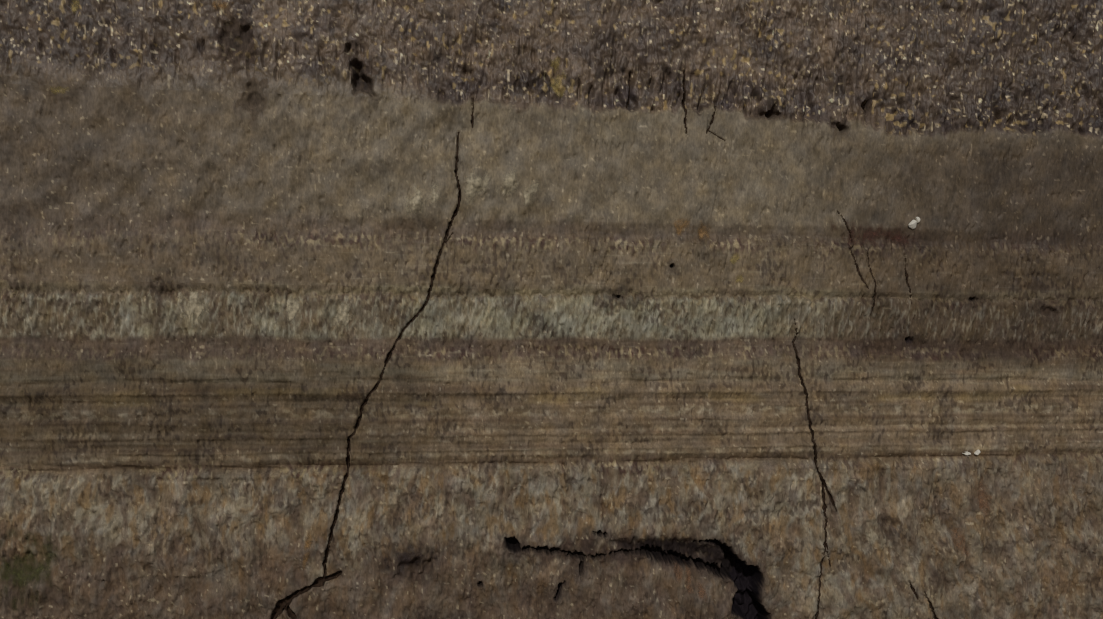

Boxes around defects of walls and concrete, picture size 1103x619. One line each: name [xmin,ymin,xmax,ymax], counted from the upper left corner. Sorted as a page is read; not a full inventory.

crack [271,98,474,619]
crack [793,323,837,619]
crack [837,210,877,311]